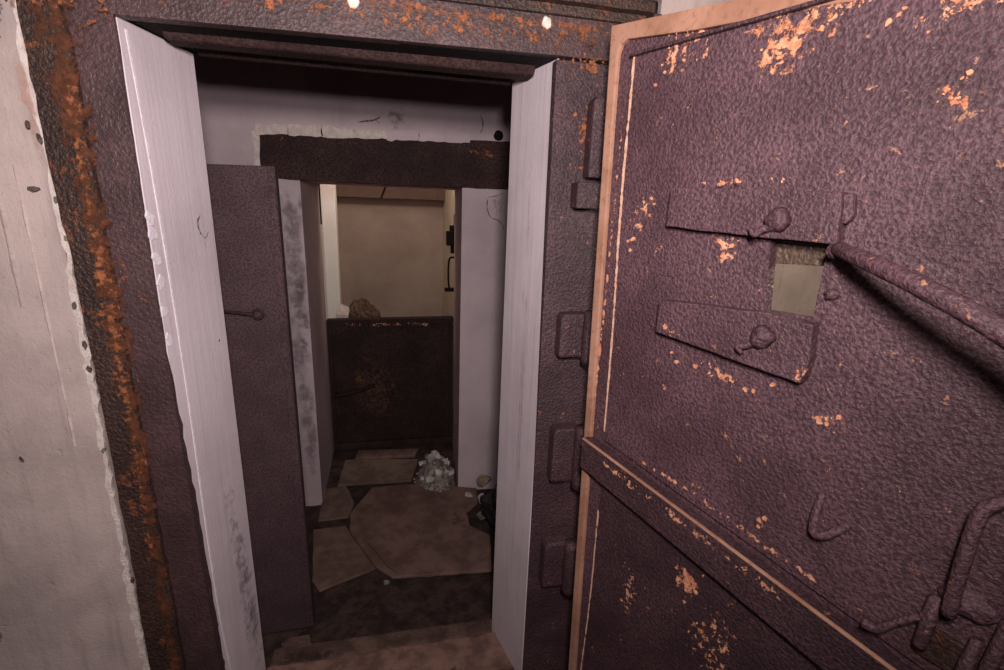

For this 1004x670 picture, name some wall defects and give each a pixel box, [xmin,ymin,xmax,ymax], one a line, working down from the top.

corrosion [242,0,297,10]
corrosion [308,0,608,86]
corrosion [573,106,588,182]
corrosion [595,175,618,397]
corrosion [27,0,180,670]